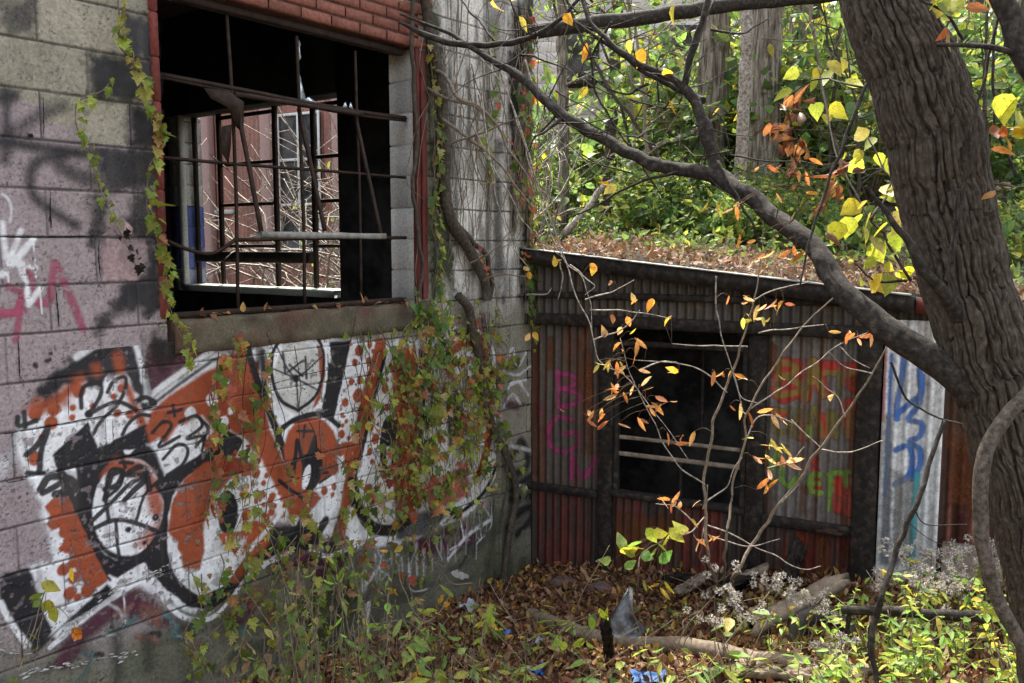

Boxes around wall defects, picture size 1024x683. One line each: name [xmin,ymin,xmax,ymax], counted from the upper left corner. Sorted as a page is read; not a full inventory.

leakage [426,12,458,300]
leakage [483,0,533,274]
leakage [518,263,529,302]
corrosion [532,338,554,450]
corrosion [615,513,681,570]
corrosion [946,410,973,544]